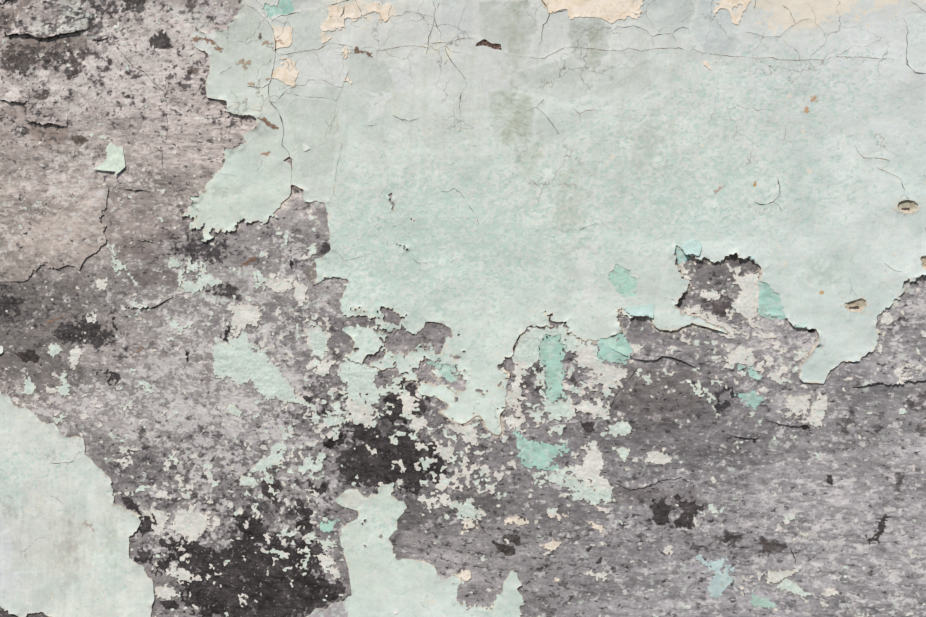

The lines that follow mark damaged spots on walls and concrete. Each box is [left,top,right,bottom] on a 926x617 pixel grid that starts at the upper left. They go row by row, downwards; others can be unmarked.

crack [247,0,470,198]
crack [505,0,926,74]
peeling [0,0,665,617]
peeling [514,400,797,617]
peeling [597,239,926,617]